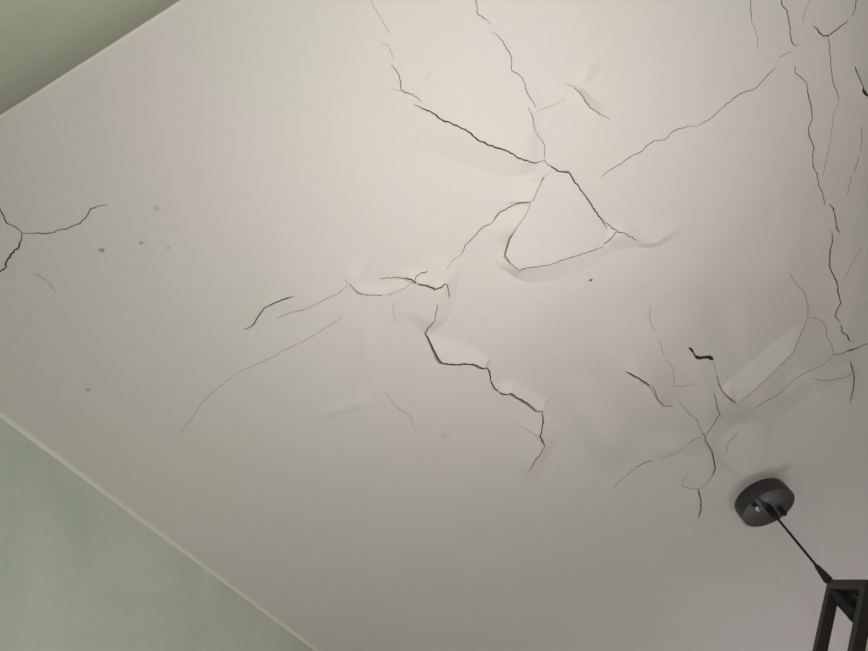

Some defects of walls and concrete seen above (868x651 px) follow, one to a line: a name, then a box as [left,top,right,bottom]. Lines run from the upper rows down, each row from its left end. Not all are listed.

crack [0,205,106,272]
crack [182,317,343,431]
crack [279,0,638,470]
crack [603,0,868,519]